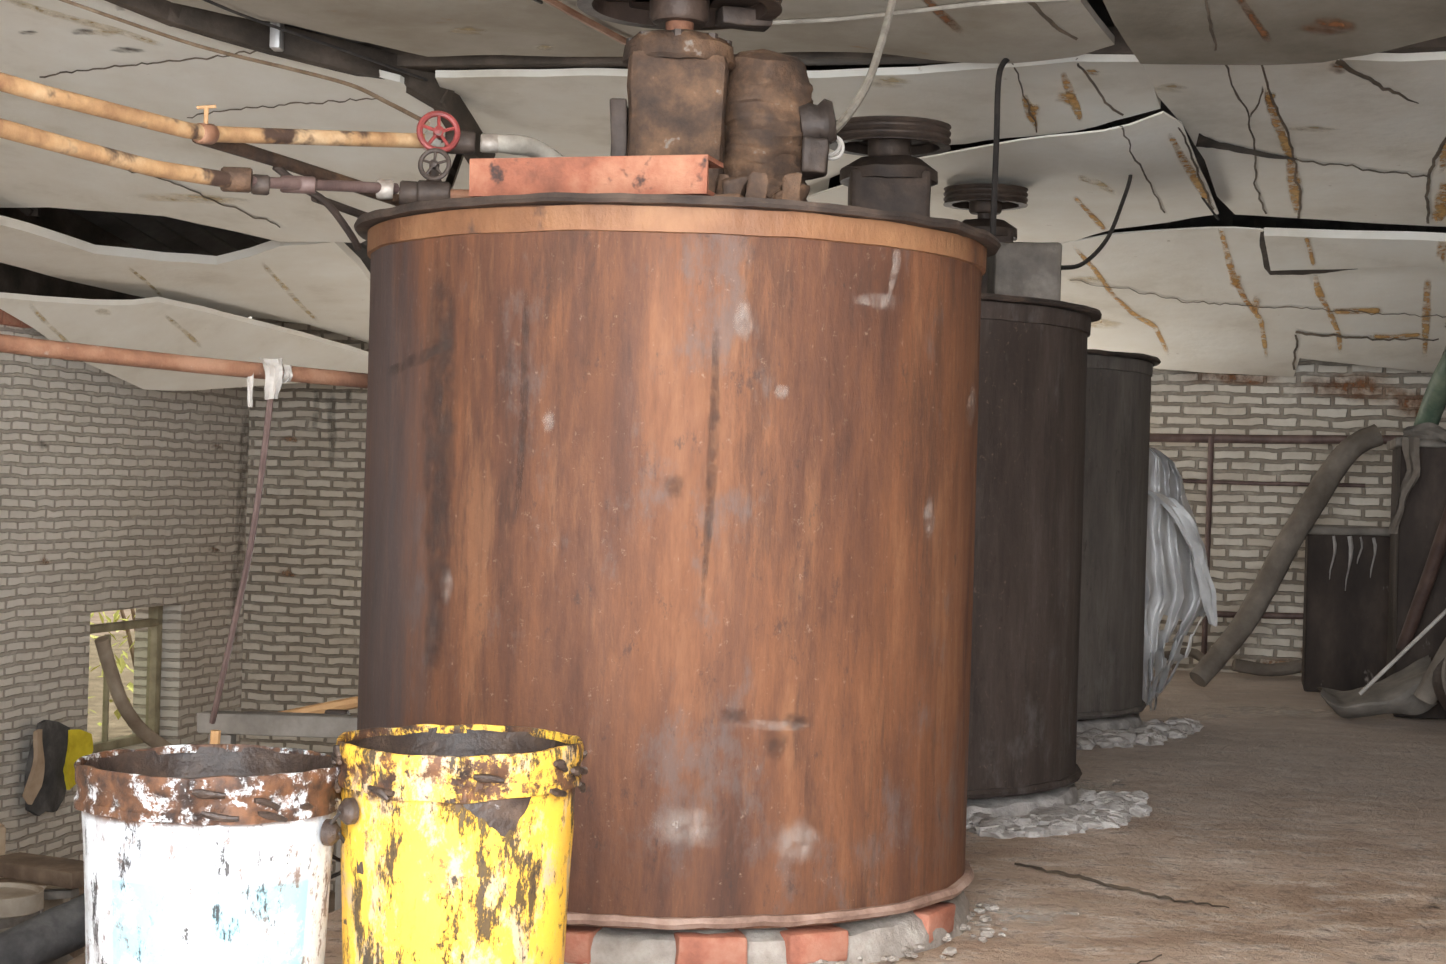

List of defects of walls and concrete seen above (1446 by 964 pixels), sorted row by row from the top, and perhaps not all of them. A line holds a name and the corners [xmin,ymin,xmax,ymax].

corrosion [923,0,955,27]
crack [1012,63,1037,133]
corrosion [1061,76,1082,119]
crack [1028,2,1166,213]
corrosion [1075,198,1105,229]
crack [1070,0,1446,370]
corrosion [1265,94,1300,210]
corrosion [1079,254,1165,347]
corrosion [1220,231,1267,353]
corrosion [1314,283,1380,350]
corrosion [1374,282,1430,350]
crack [1014,863,1229,908]